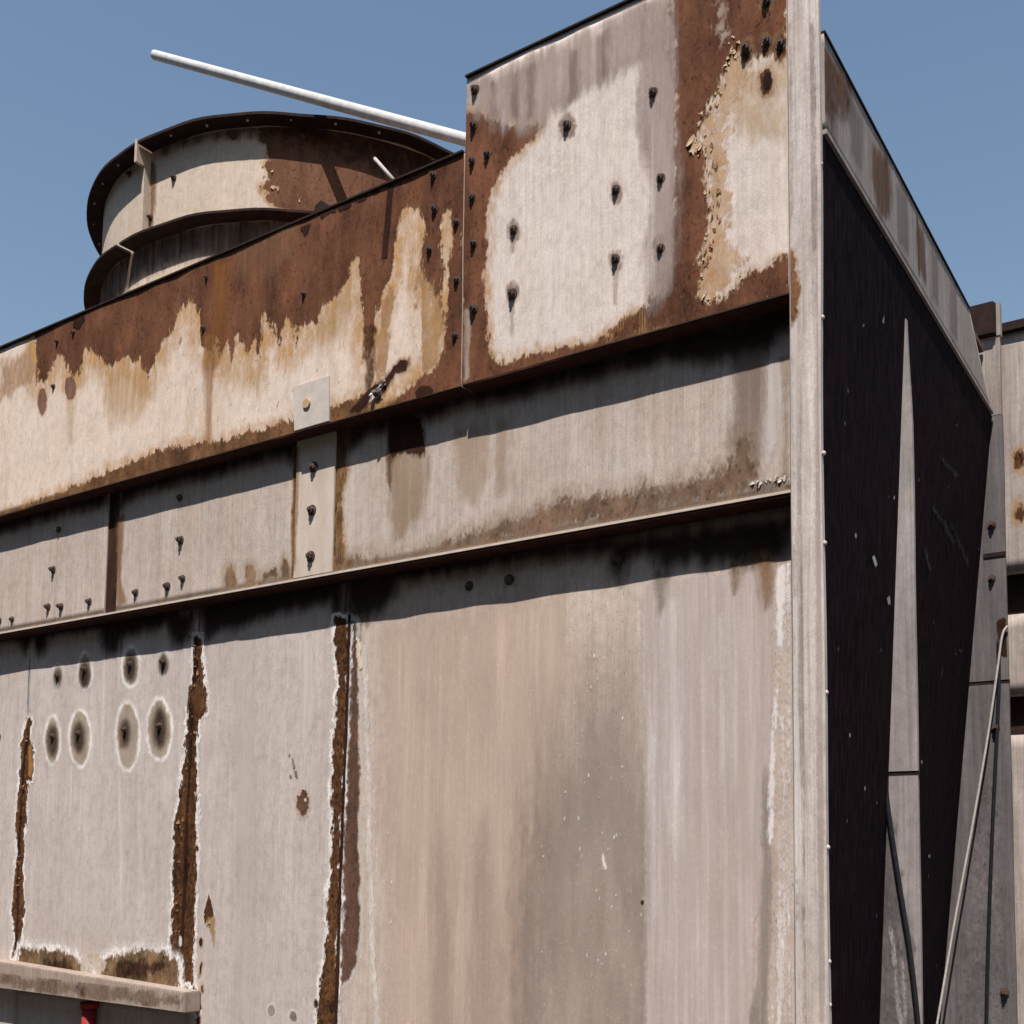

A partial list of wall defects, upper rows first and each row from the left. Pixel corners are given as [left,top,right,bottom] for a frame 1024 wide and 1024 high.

peeling [686,35,749,302]
corrosion [0,0,801,1024]
leakage [733,317,797,466]
leakage [356,637,380,1024]
leakage [383,457,805,1024]